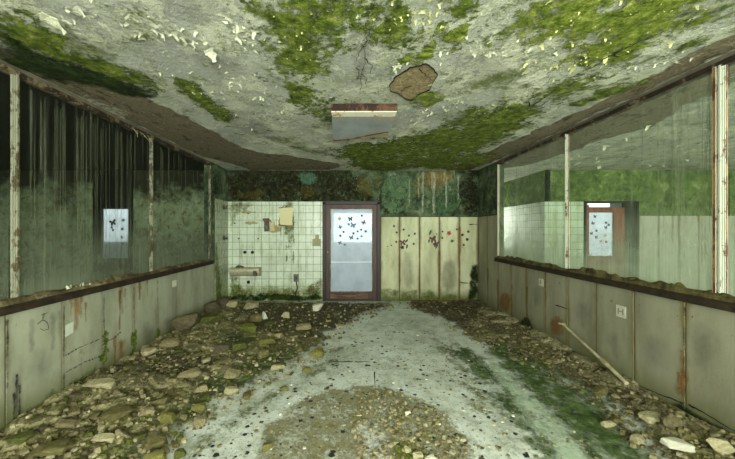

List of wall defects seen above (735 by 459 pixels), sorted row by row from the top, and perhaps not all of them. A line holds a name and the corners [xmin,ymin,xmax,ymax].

peeling [34,5,111,35]
peeling [116,8,318,146]
crack [355,22,374,90]
spalling [389,35,522,101]